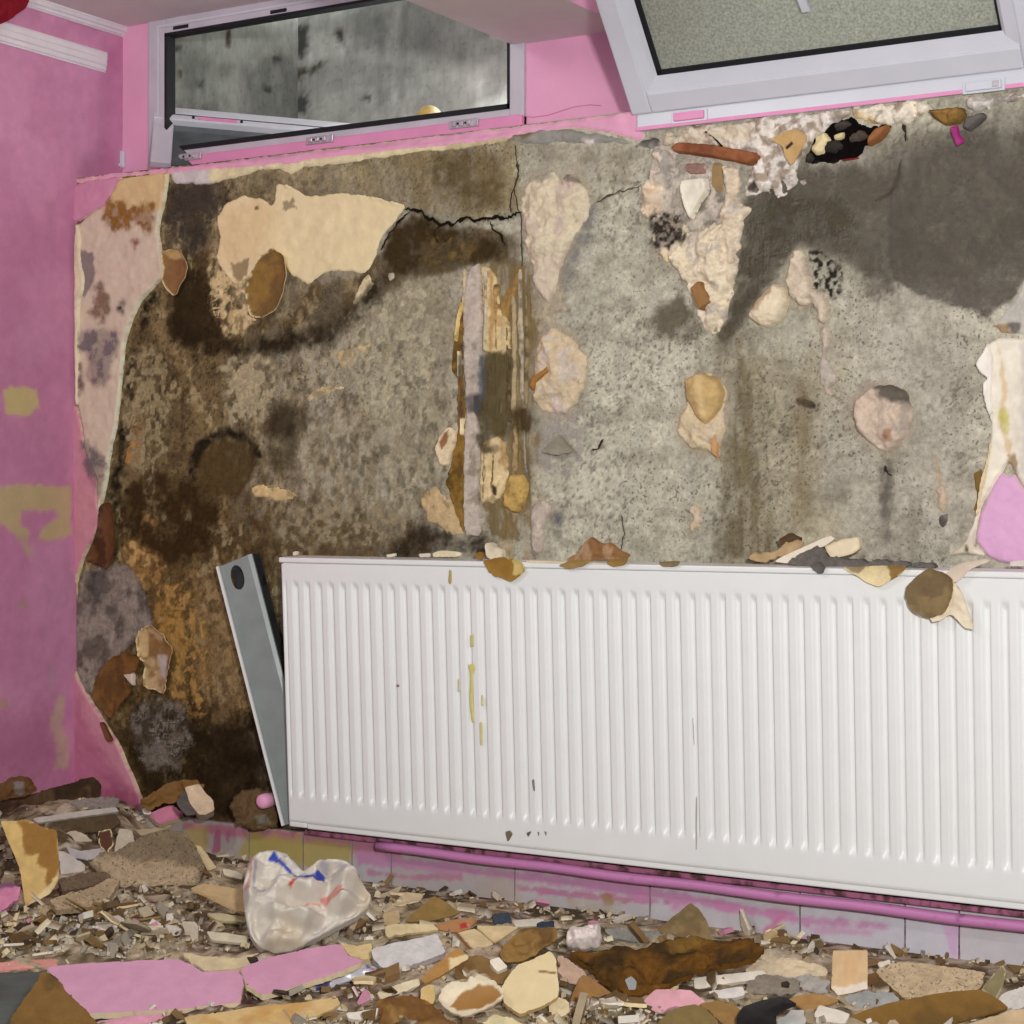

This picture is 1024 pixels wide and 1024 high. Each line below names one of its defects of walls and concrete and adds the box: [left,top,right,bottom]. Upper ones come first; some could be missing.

water stain [169,270,334,356]
water stain [355,284,378,313]
water stain [384,216,465,274]
crack [381,145,523,267]
peeling [74,93,1024,511]
water stain [719,136,1024,340]
water stain [111,403,305,563]
water stain [393,526,486,557]
spalling [474,500,552,581]
peeling [560,559,592,569]
spalling [844,281,1024,629]
flaking render [76,564,204,816]